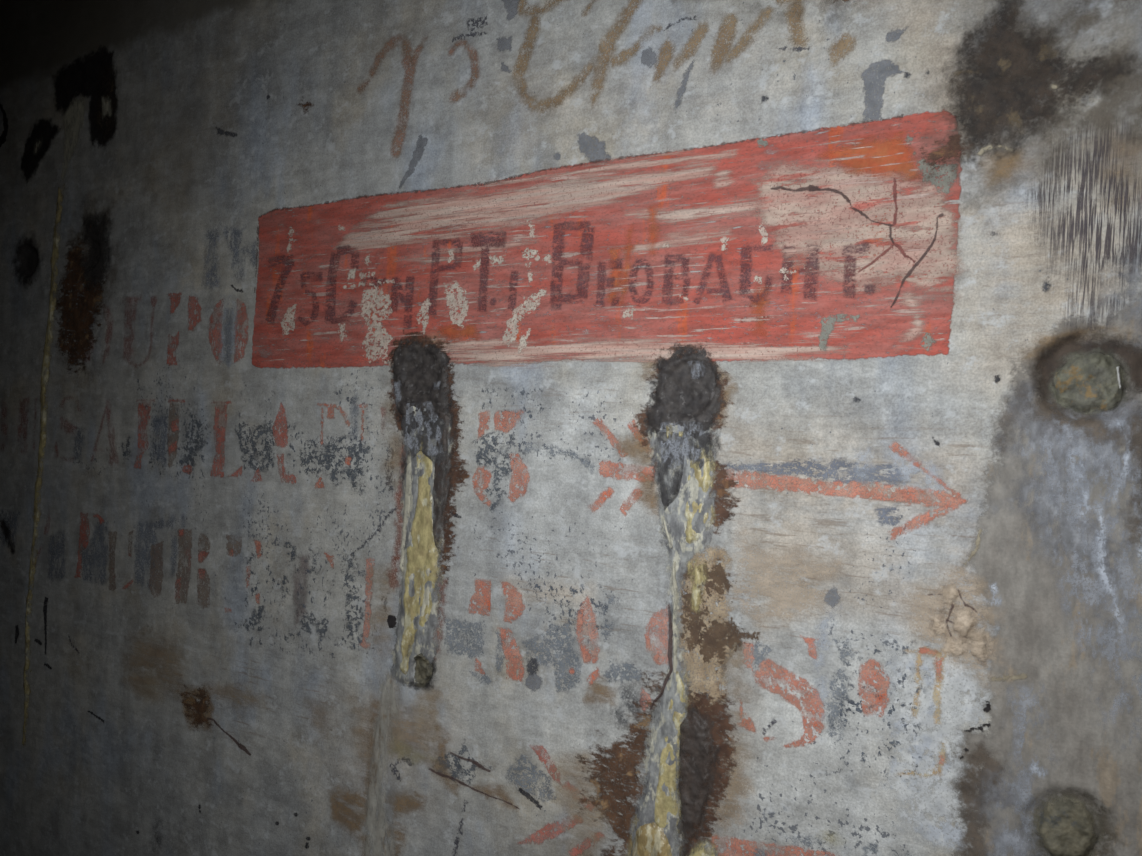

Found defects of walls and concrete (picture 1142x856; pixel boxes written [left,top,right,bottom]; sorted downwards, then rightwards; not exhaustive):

crack [0,104,8,147]
rust [56,238,105,373]
crack [771,178,943,307]
water stain [21,47,117,746]
water stain [923,0,1142,856]
water stain [390,487,404,586]
rust [180,685,251,755]
water stain [676,693,741,856]